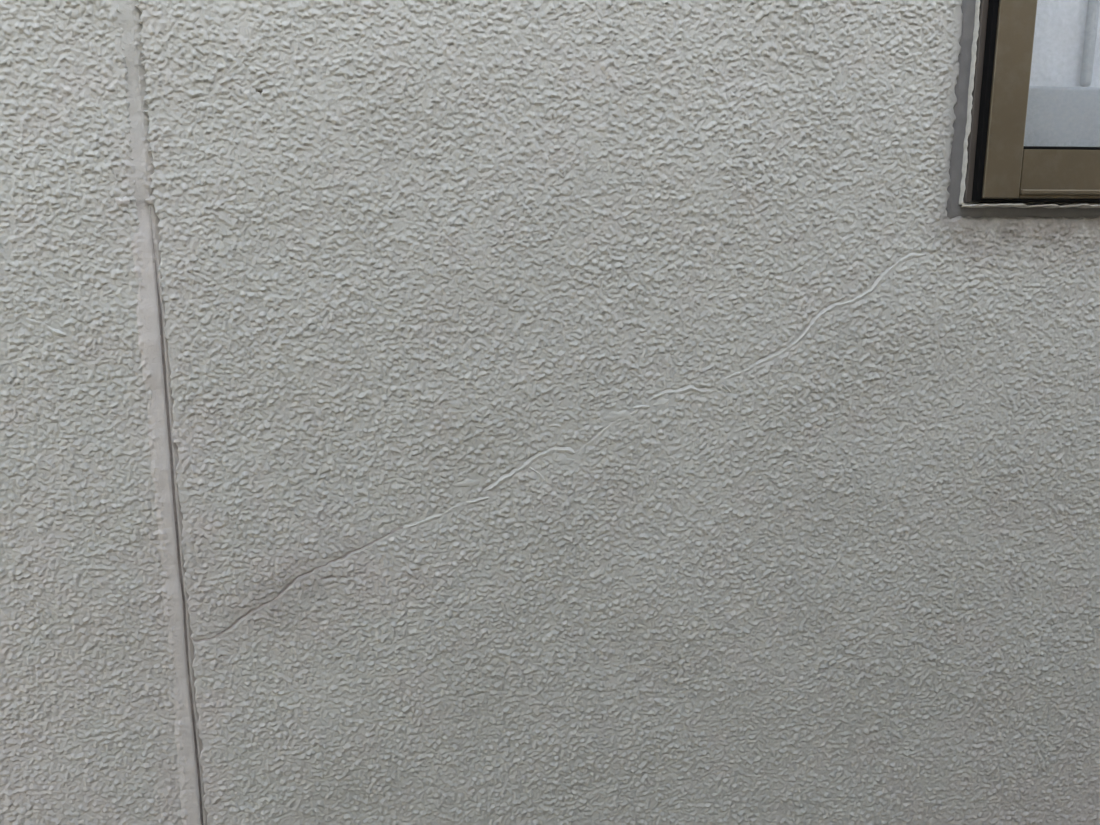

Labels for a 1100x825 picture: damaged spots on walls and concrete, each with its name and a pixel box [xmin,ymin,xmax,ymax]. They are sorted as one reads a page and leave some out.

crack [150,212,925,825]